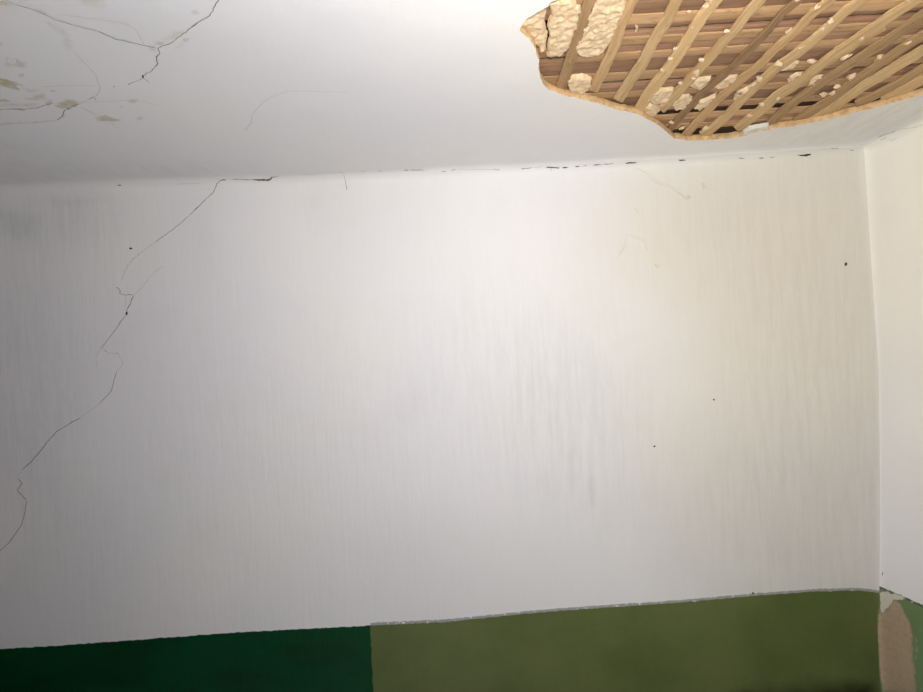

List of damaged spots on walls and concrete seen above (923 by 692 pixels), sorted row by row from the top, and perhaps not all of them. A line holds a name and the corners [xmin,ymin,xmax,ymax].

damp [0,89,139,131]
damp [0,0,192,54]
crack [0,0,219,125]
spalling [520,0,923,141]
crack [522,161,637,169]
crack [1,177,273,550]
peeling [877,591,919,692]